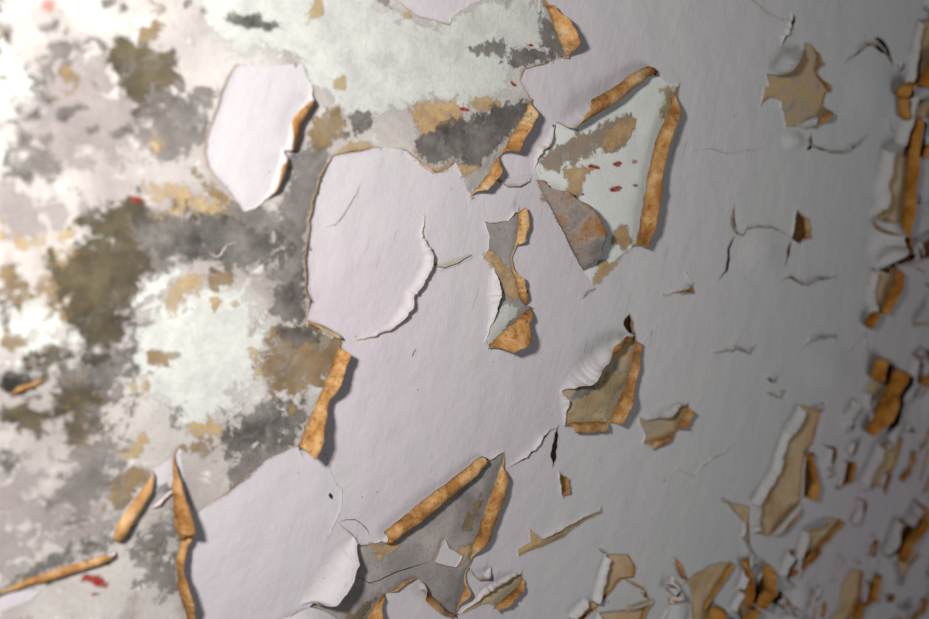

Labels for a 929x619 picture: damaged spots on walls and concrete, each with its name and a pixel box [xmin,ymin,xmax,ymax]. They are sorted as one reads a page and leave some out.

flaking render [0,0,695,619]
peeling [757,40,833,133]
peeling [788,207,810,247]
peeling [864,17,929,329]
peeling [561,346,929,619]